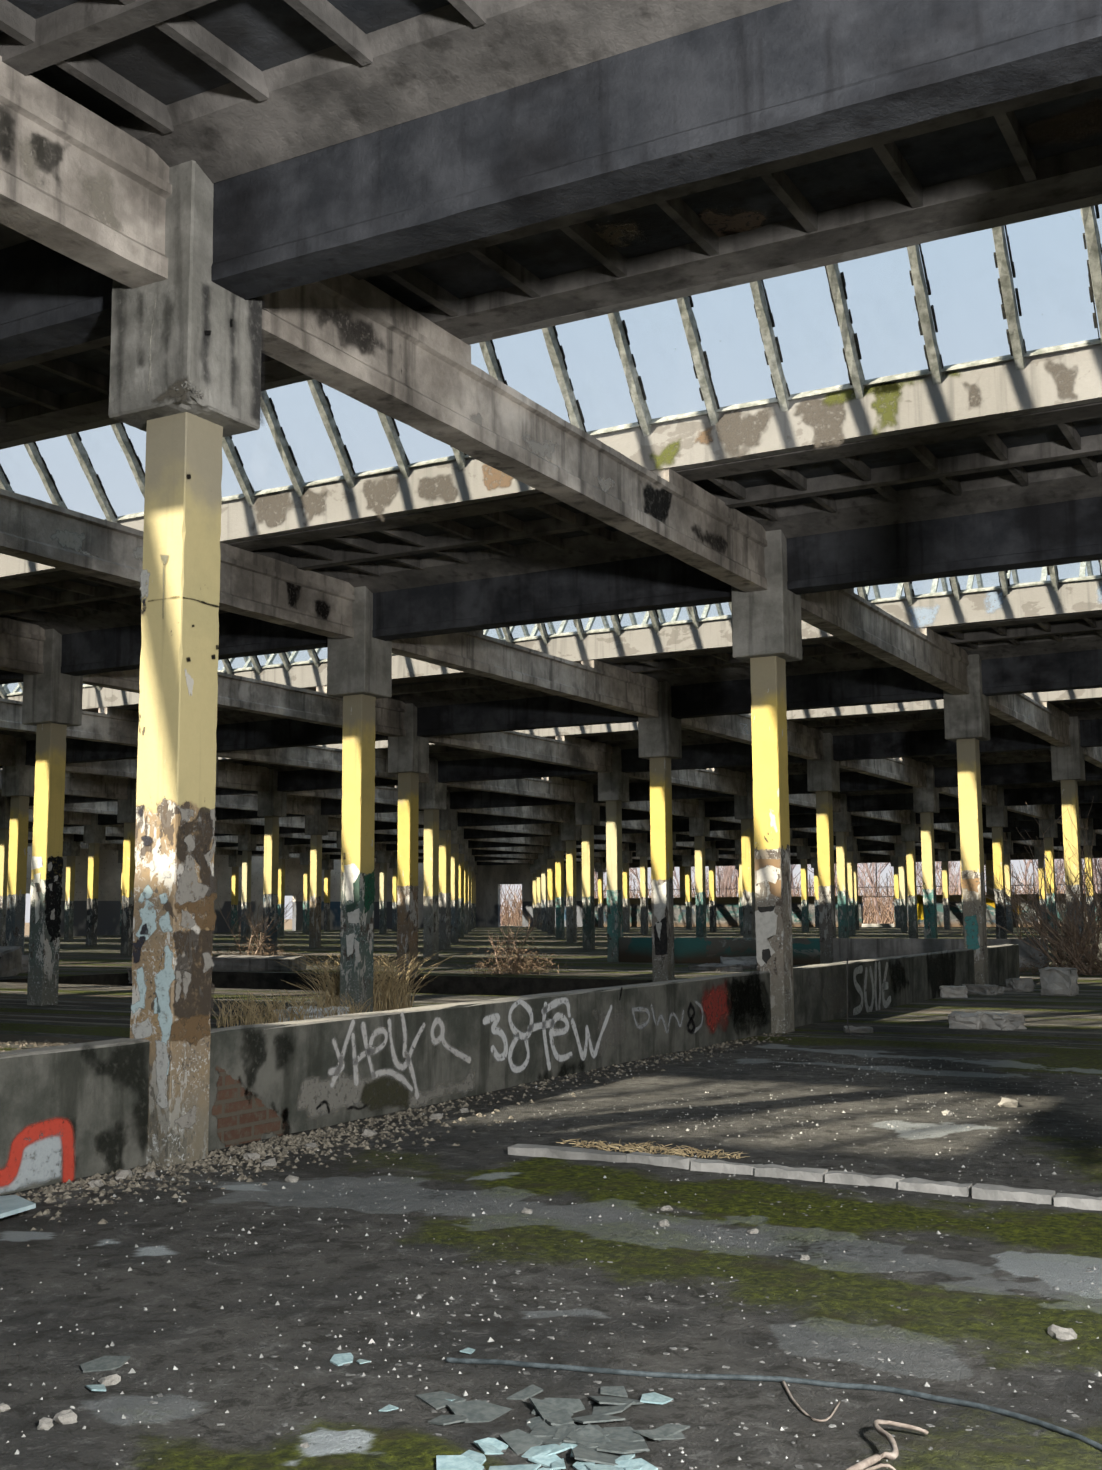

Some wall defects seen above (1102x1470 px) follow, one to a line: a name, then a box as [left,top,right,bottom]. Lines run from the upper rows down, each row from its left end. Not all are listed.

water stain [0,107,63,178]
water stain [319,309,383,353]
water stain [692,525,728,552]
peeling [140,570,150,614]
peeling [58,805,474,1147]
spalling [373,975,653,996]